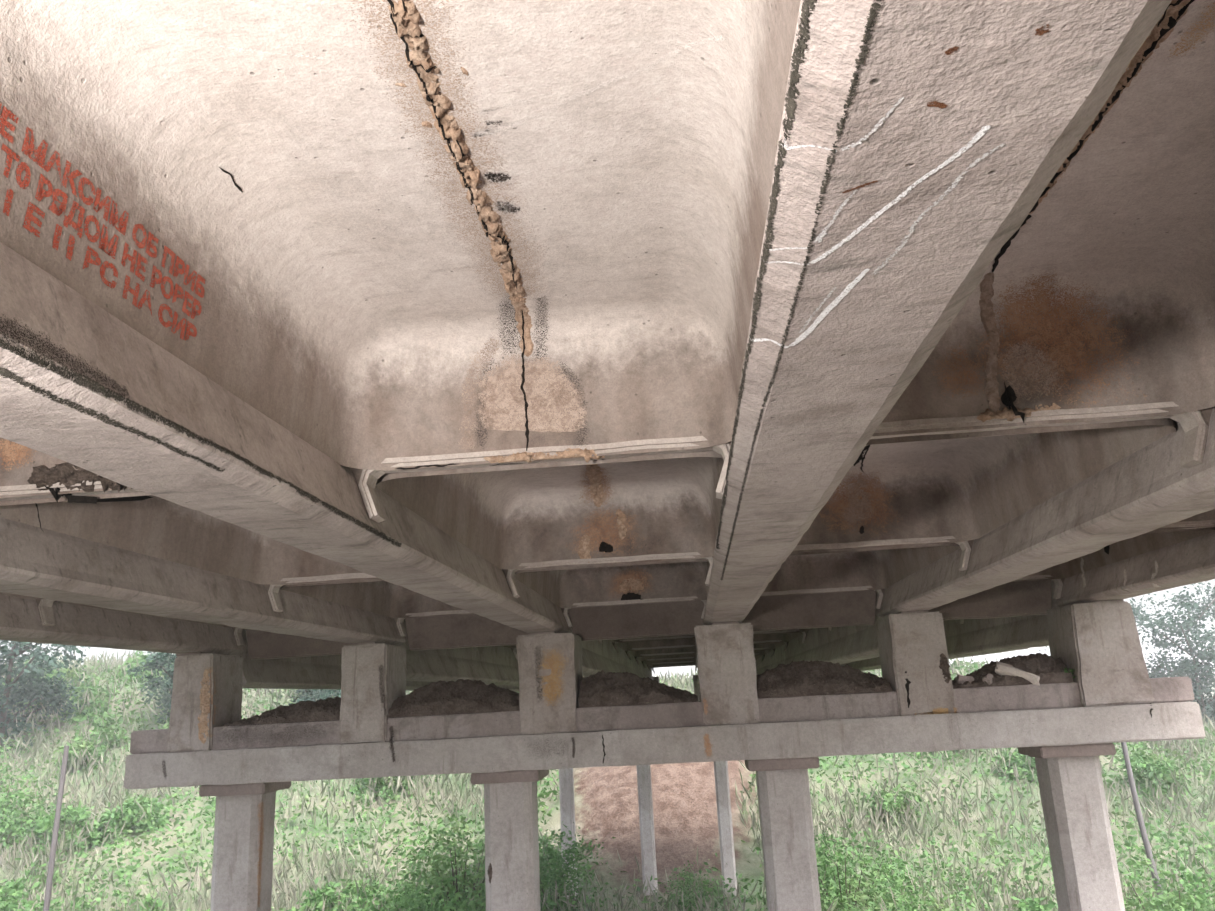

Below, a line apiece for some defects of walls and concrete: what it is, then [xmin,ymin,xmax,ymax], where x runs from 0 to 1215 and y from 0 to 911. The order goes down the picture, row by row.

crack [343,0,547,307]
crack [992,0,1215,272]
water stain [459,296,589,463]
spalling [27,462,153,532]
rust [565,464,654,600]